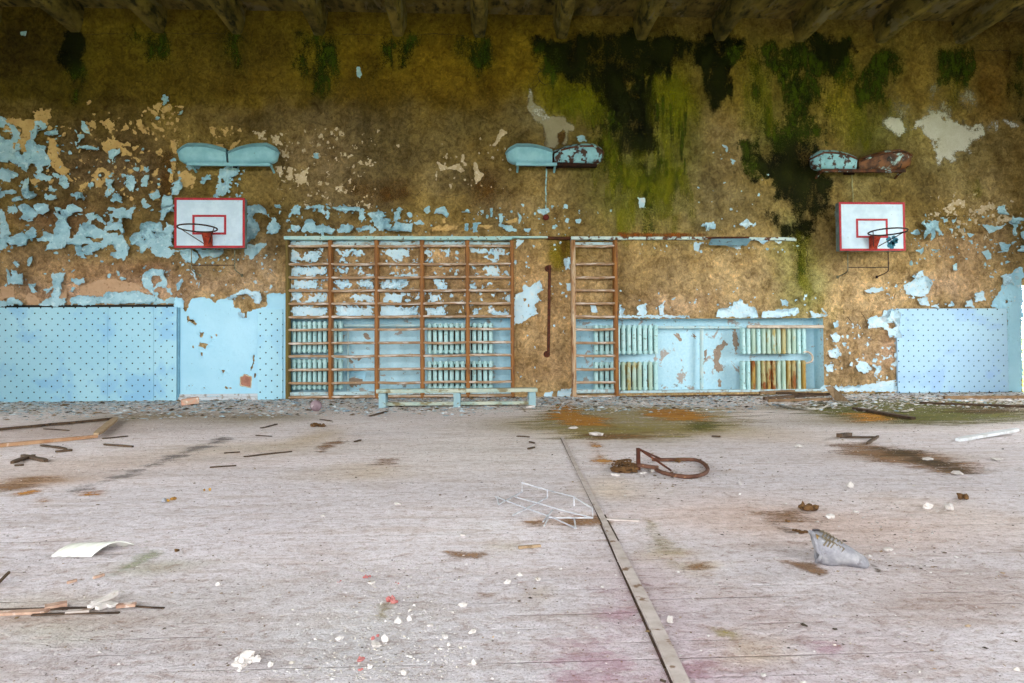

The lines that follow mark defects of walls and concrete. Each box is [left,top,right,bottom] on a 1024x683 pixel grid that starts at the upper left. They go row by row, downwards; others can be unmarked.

leakage [57,28,87,106]
leakage [527,27,747,233]
leakage [733,31,859,279]
leakage [883,83,1019,164]
peeling [0,94,581,406]
leakage [549,235,576,272]
peeling [618,205,1024,393]
leakage [512,404,753,464]
leakage [829,442,981,474]